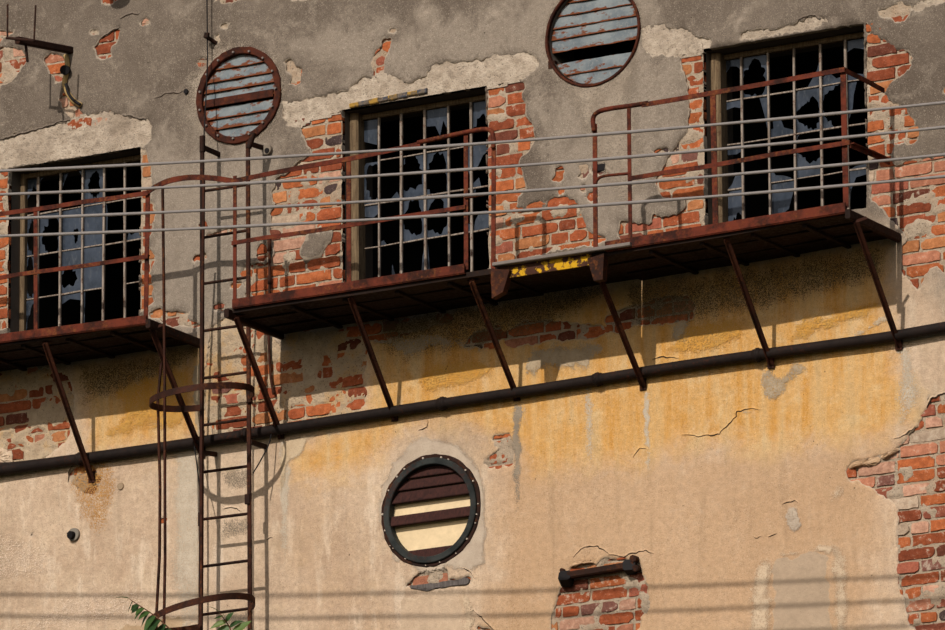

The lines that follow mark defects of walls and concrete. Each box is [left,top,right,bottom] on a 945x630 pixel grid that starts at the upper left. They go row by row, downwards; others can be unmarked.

flaking render [0,31,26,86]
flaking render [231,29,611,296]
flaking render [866,0,945,289]
flaking render [0,54,455,437]
flaking render [466,295,742,375]
flaking render [0,367,75,462]
corrosion [71,461,117,533]
peeling [279,429,341,491]
flaking render [483,434,514,469]
crack [682,406,761,437]
flaking render [846,394,945,630]
flaking render [551,557,650,630]